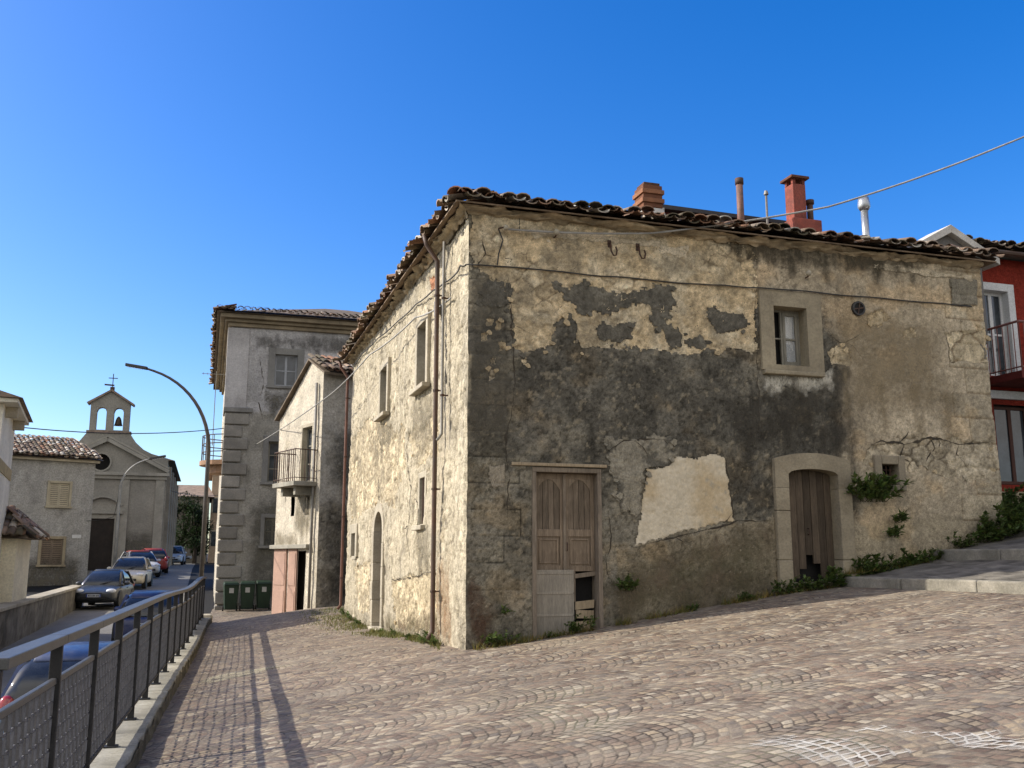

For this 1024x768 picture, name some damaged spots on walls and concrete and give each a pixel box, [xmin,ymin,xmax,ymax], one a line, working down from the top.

flaking render [469,214,759,381]
flaking render [827,343,852,366]
flaking render [603,433,677,517]
crack [871,431,990,466]